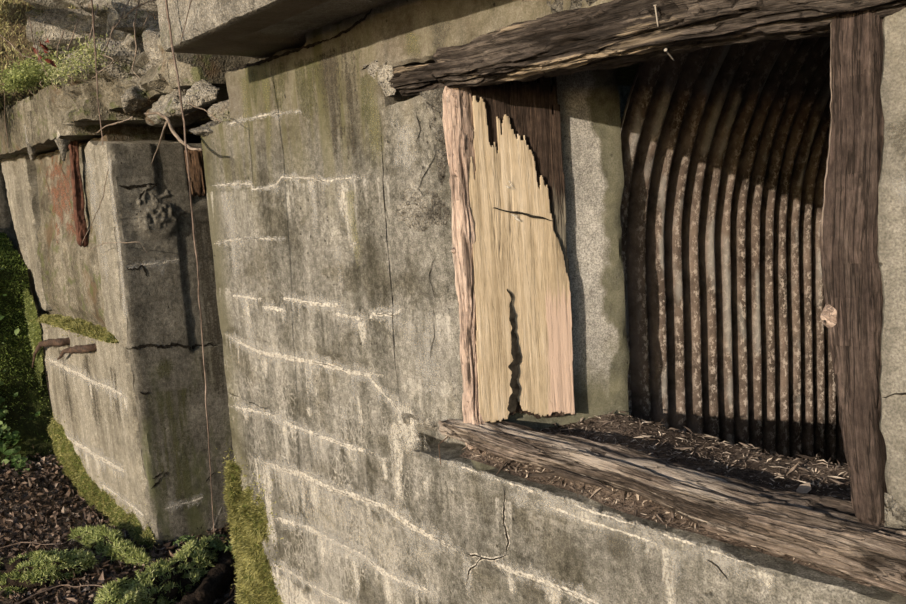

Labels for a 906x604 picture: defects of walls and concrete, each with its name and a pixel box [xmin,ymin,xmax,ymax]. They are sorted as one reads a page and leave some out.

spalling [363,59,396,96]
crack [119,183,157,199]
crack [128,338,236,350]
crack [433,491,510,585]